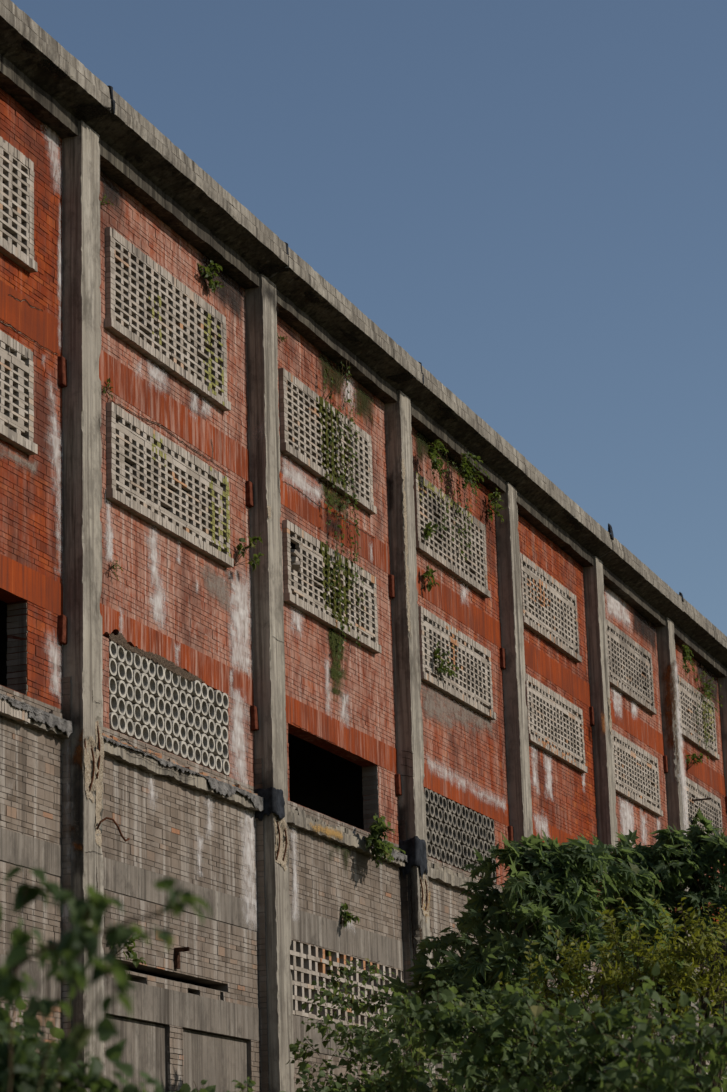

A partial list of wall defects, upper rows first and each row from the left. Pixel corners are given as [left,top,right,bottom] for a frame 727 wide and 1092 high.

crack [0,294,58,355]
damp [150,530,163,621]